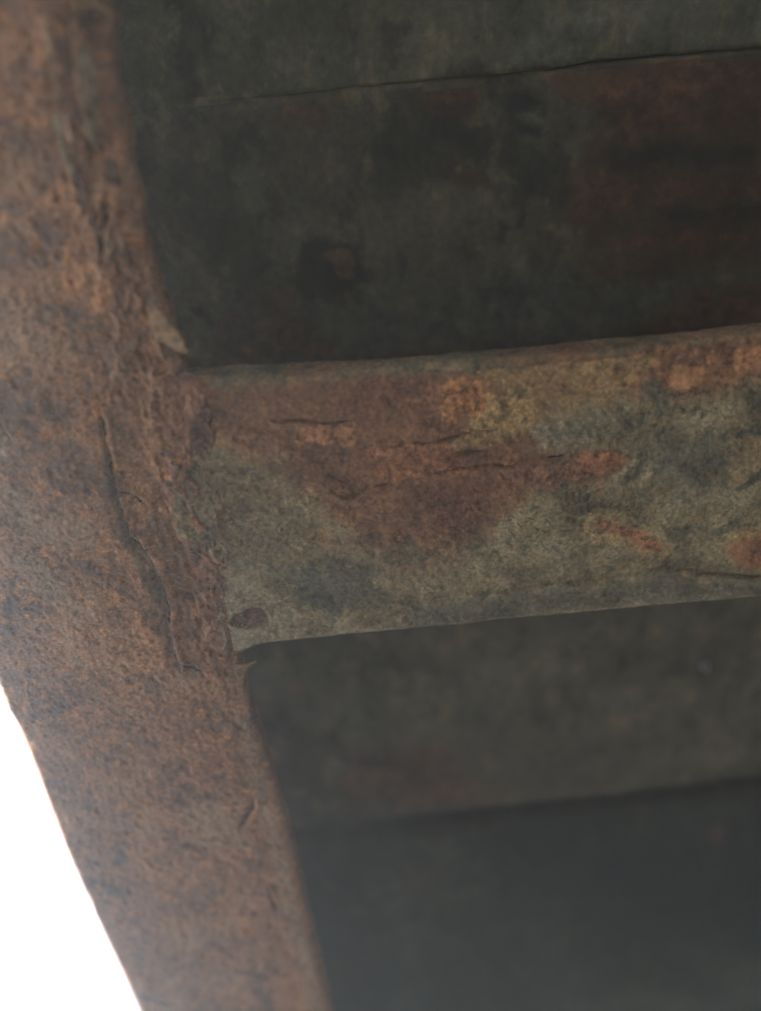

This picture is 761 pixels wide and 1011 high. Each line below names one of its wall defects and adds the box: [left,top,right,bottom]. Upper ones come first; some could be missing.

damp [122,0,238,106]
damp [450,0,761,69]
damp [154,77,718,361]
rust [145,298,320,367]
rust [182,343,761,558]
crack [395,430,563,474]
rust [112,452,176,599]
crack [99,398,201,678]
rust [572,505,676,568]
rust [706,514,761,579]
rust [115,607,182,688]